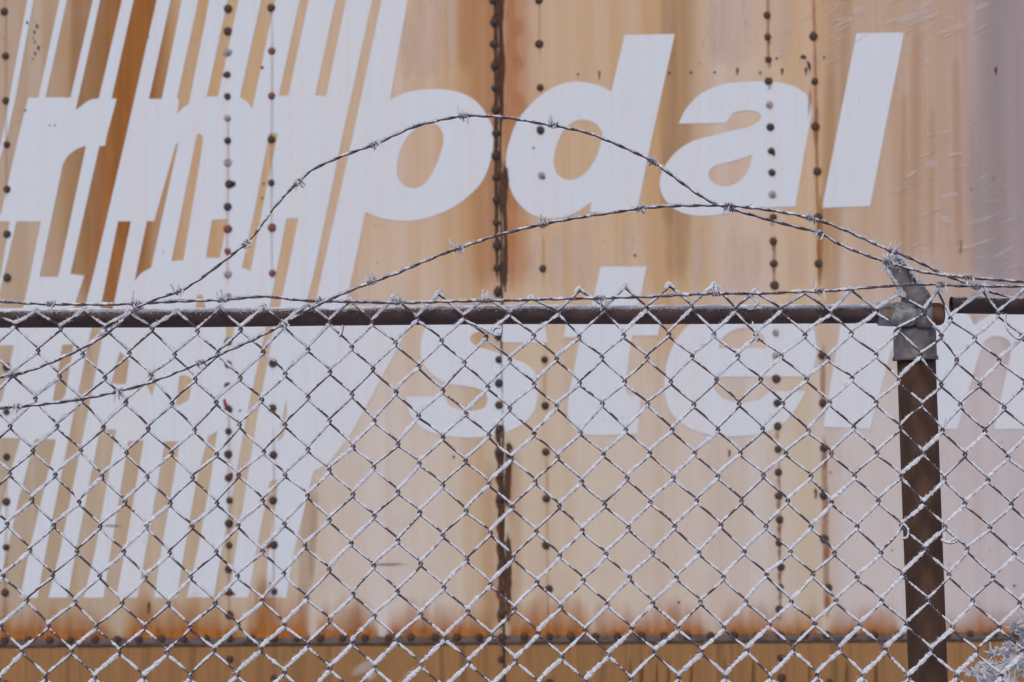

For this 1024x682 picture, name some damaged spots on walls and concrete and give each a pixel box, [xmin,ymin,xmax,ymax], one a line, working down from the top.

rust [492,0,509,299]
rust [131,602,237,638]
rust [0,626,106,639]
rust [250,618,307,638]
rust [320,623,376,637]
rust [391,625,489,637]
rust [603,624,702,635]
rust [724,624,816,634]
rust [833,625,896,634]